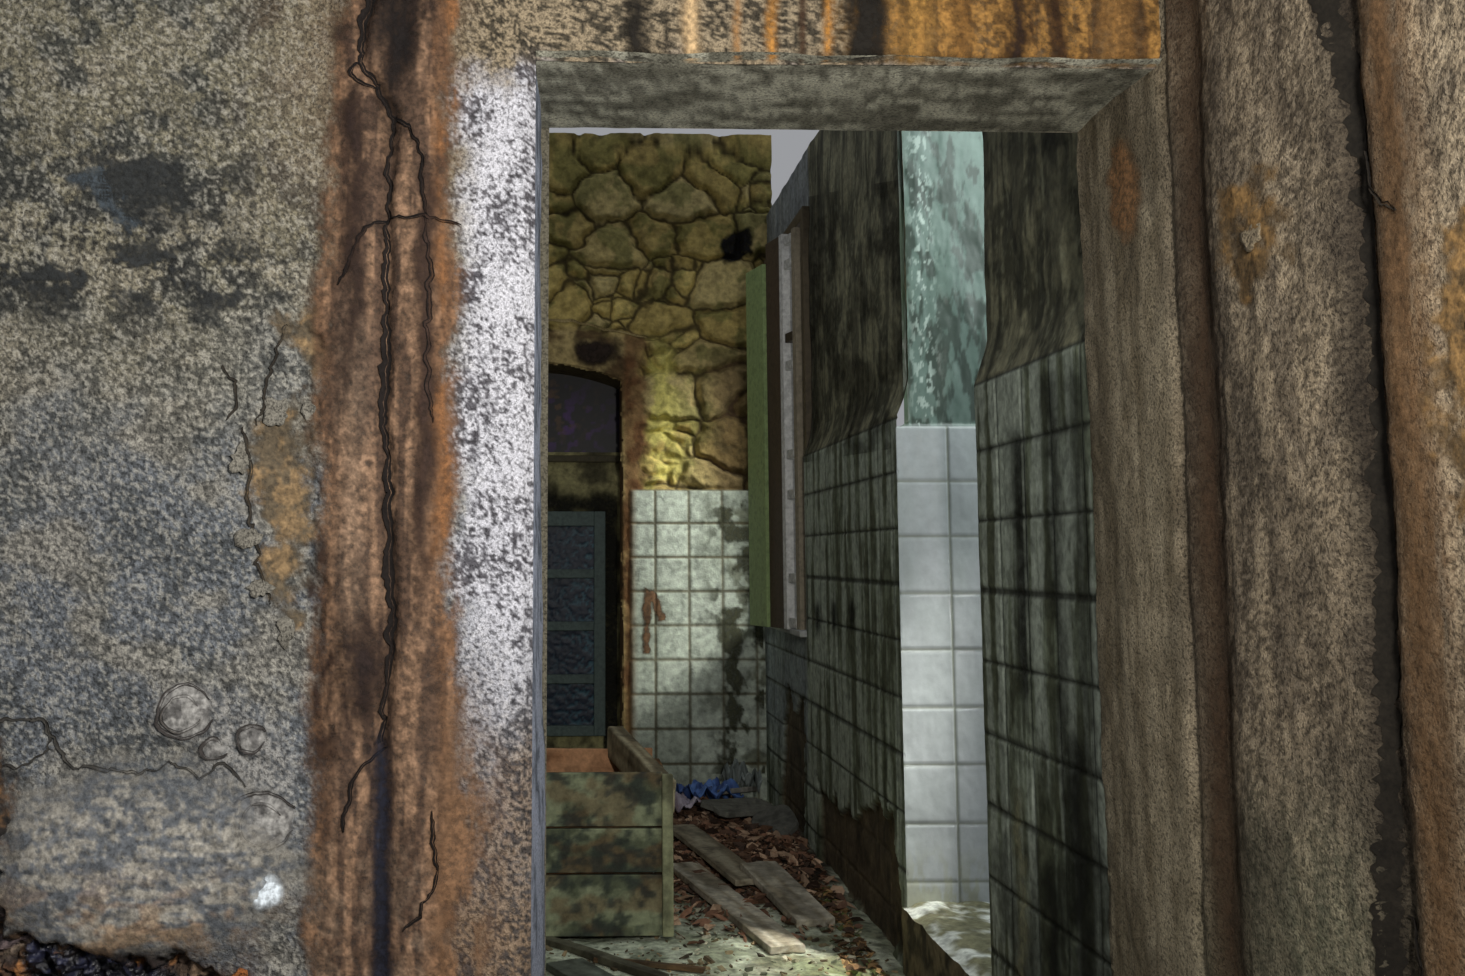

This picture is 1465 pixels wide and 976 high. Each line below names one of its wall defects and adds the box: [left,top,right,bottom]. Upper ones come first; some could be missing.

corrosion [684,0,697,59]
corrosion [767,5,775,60]
corrosion [883,0,1161,64]
leakage [0,232,88,308]
leakage [67,146,260,316]
crack [337,0,461,832]
corrosion [302,0,482,976]
crack [1308,0,1424,976]
crack [403,811,439,931]
spalling [0,907,248,976]